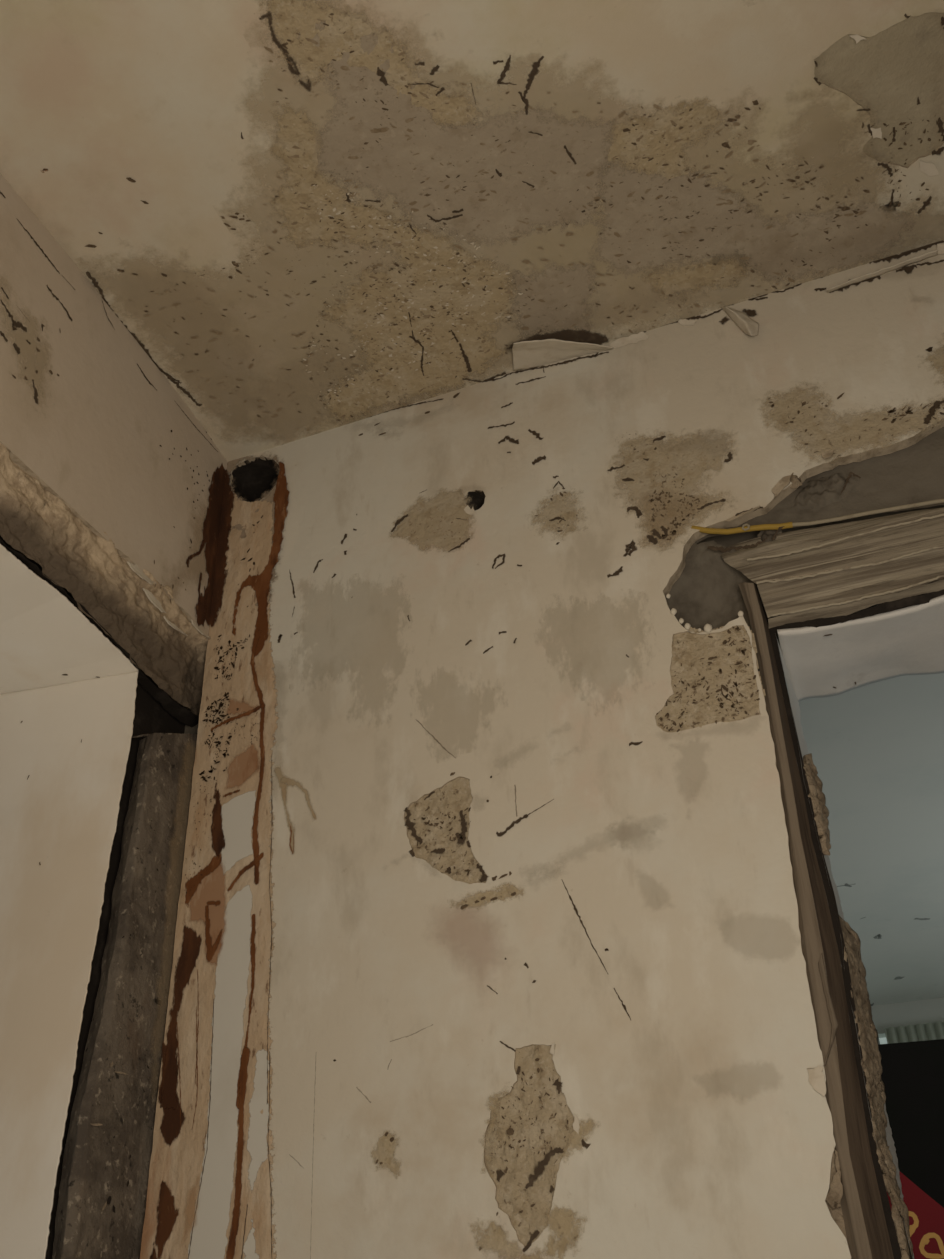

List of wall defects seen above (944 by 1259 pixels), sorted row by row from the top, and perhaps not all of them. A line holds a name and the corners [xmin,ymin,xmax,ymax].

spalling [814,12,944,214]
peeling [720,294,768,336]
spalling [882,400,944,424]
spalling [647,526,668,544]
spalling [655,541,766,735]
corrosion [158,462,290,1147]
spalling [404,772,523,910]
corrosion [150,1181,195,1259]
corrosion [226,914,256,1259]
spalling [473,1041,595,1259]
spalling [807,1066,826,1097]
spalling [826,1148,847,1238]